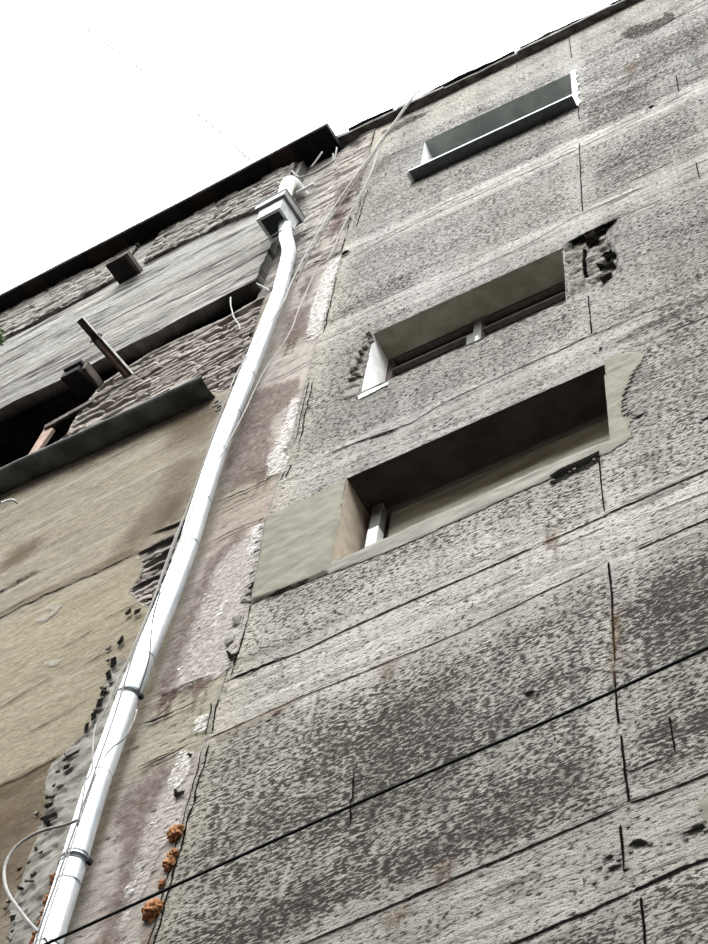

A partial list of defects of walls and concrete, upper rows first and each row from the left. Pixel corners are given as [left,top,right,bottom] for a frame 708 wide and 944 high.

spalling [561,217,619,297]
spalling [342,331,388,399]
damp [223,377,299,487]
spalling [125,519,186,616]
peeling [166,518,265,695]
spalling [84,635,124,733]
spalling [3,847,43,943]
spalling [34,749,80,827]
peeling [118,750,194,944]
crack [349,768,364,832]
spalling [572,839,653,892]
spalling [680,823,708,841]